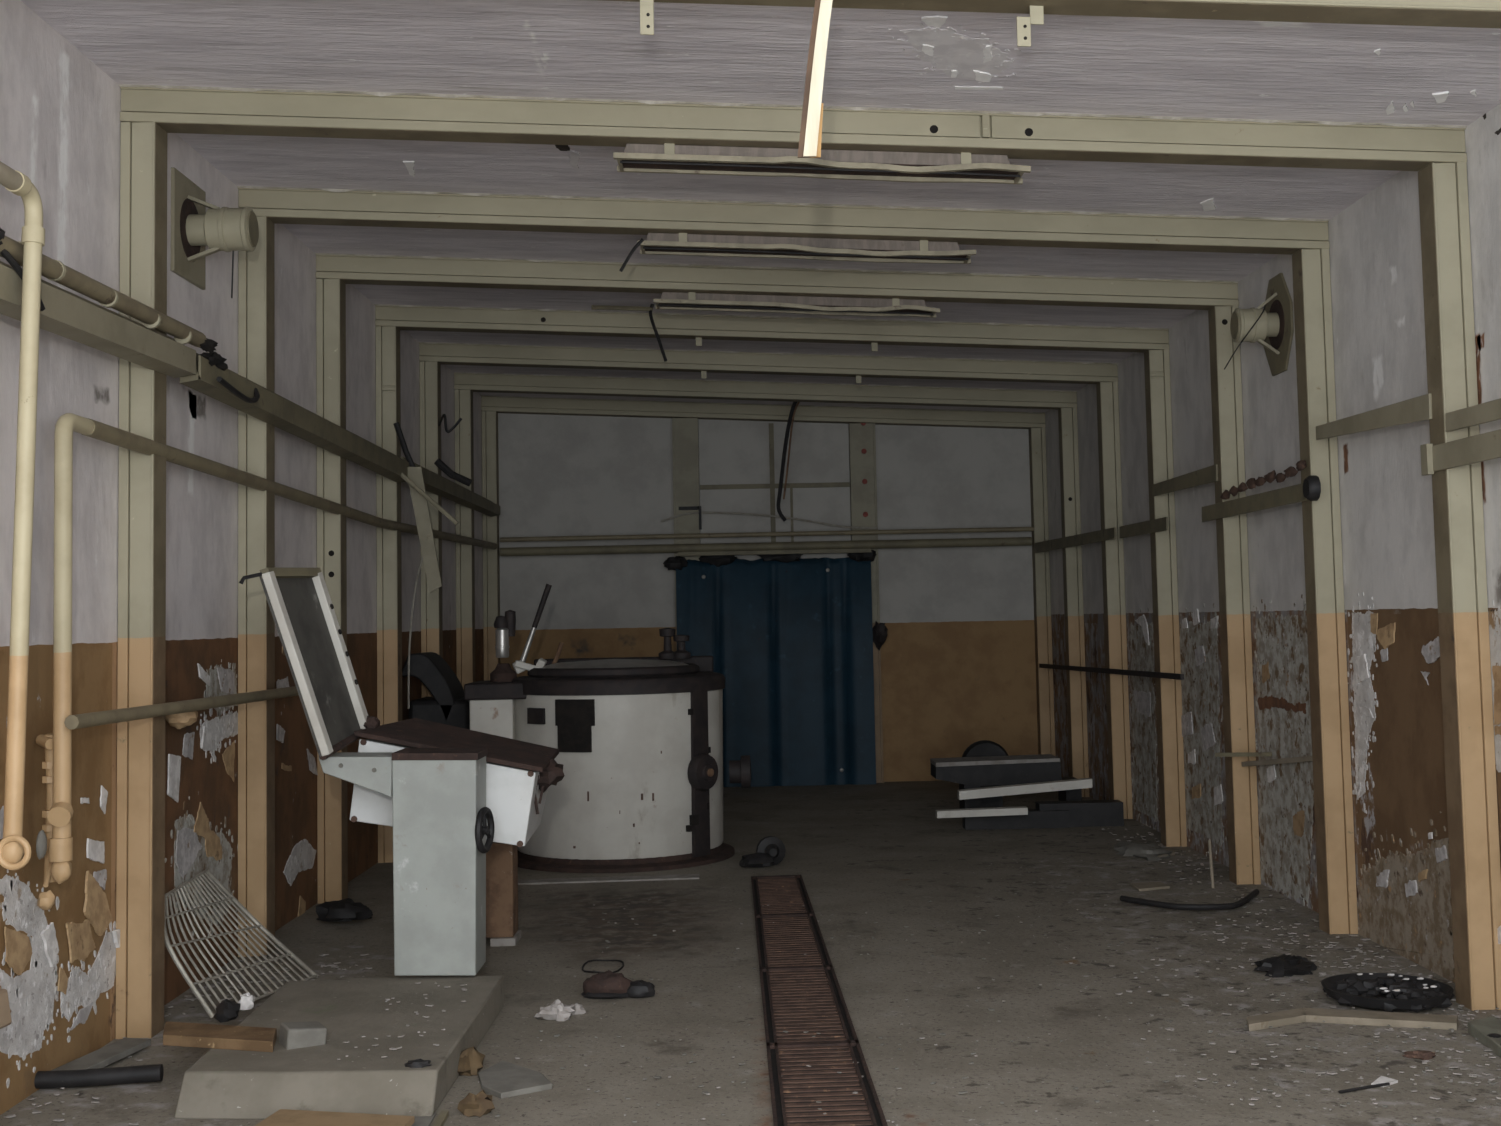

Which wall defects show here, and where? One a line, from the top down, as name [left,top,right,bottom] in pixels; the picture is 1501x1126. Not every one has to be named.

peeling [0,838,120,1088]
peeling [80,785,108,814]
peeling [165,659,238,936]
peeling [1253,594,1317,909]
peeling [1345,592,1396,814]
spalling [1357,811,1455,992]
peeling [1421,636,1440,685]
peeling [1488,600,1501,772]